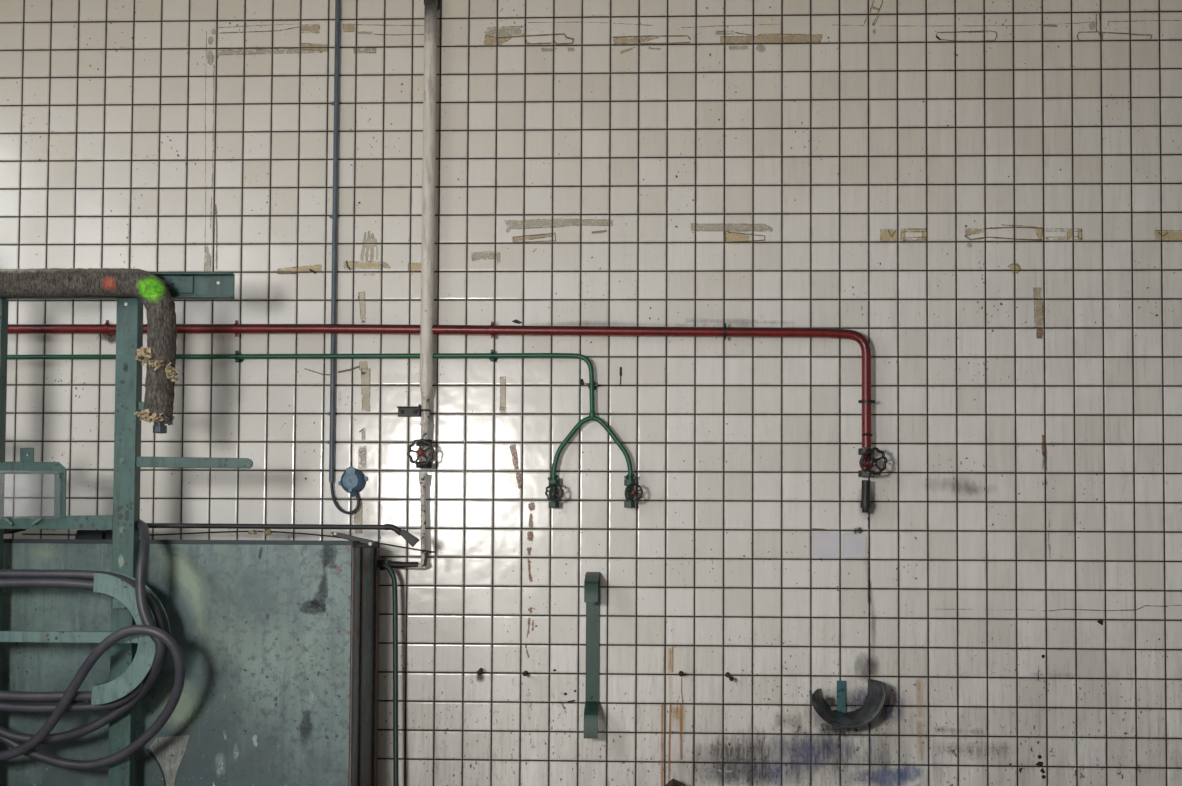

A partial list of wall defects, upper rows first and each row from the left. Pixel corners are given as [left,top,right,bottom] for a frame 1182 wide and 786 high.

rust [509,445,521,489]
rust [526,502,535,582]
rust [661,678,683,785]